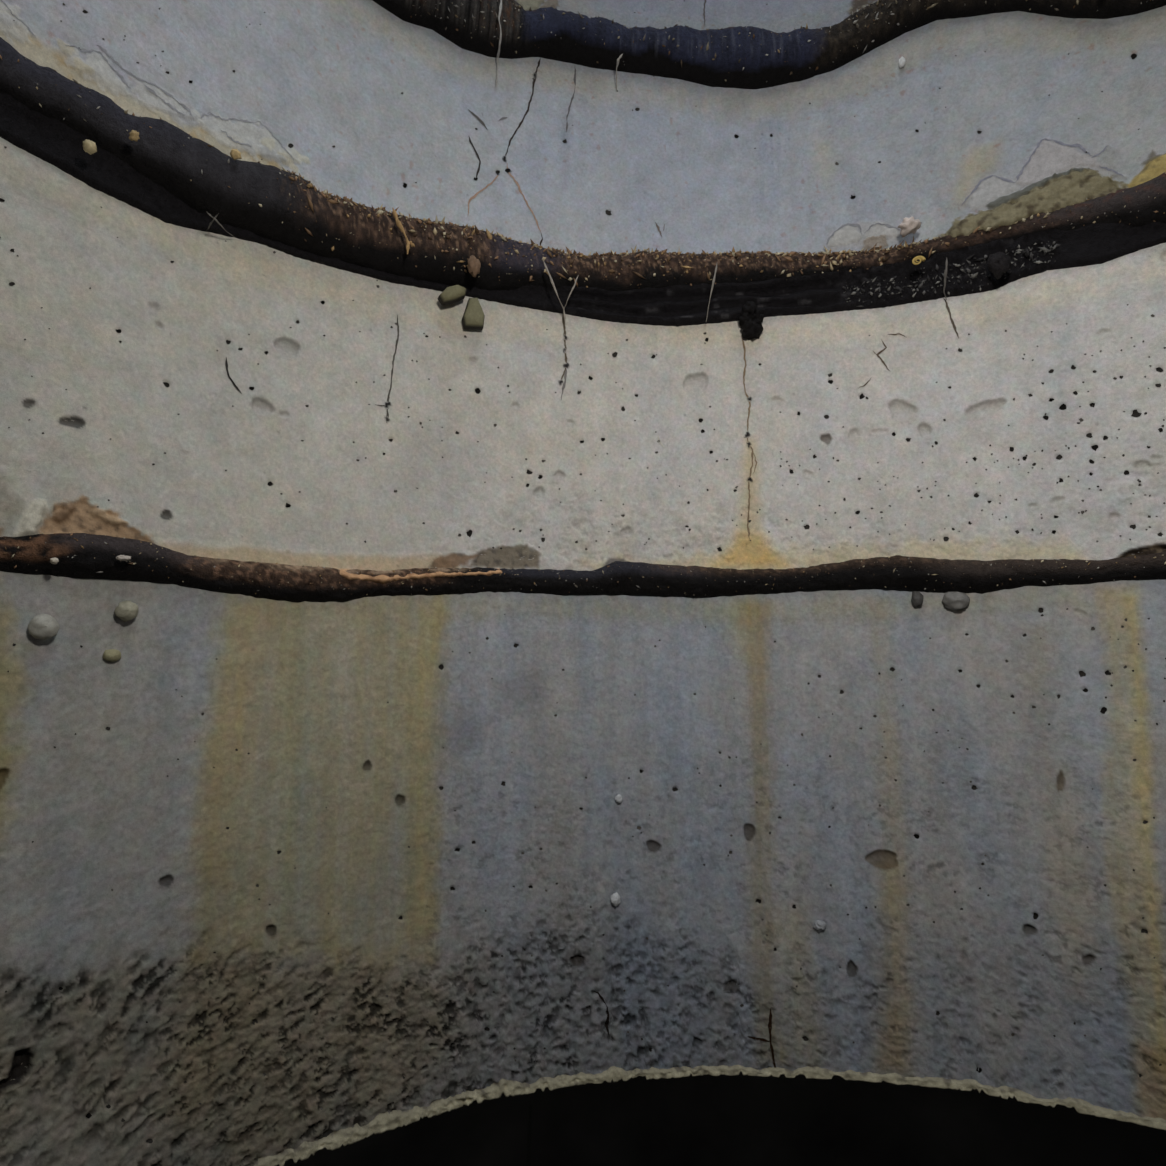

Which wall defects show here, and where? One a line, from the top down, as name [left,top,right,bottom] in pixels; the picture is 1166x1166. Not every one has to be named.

peeling [515,0,578,14]
peeling [0,0,342,198]
crack [562,68,576,144]
crack [468,58,543,245]
peeling [960,134,1132,212]
peeling [823,218,902,253]
crack [558,313,570,399]
crack [741,336,757,539]
spalling [732,462,906,547]
water stain [0,571,47,899]
water stain [145,580,1166,1166]